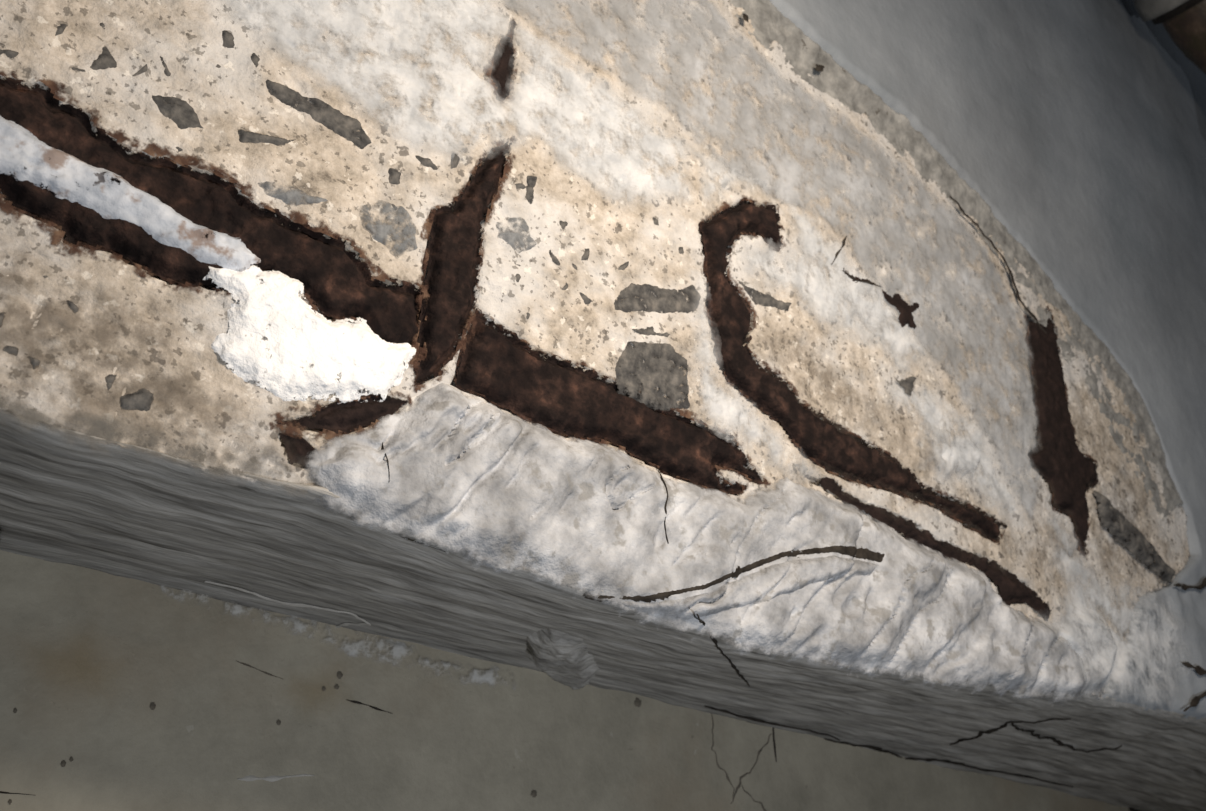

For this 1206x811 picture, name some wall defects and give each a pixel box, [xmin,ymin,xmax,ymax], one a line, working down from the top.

corrosion [483,19,518,103]
corrosion [0,193,202,293]
spalling [0,192,375,487]
corrosion [38,79,516,469]
spalling [387,322,543,428]
corrosion [671,408,771,495]
corrosion [701,196,779,223]
spalling [955,296,981,333]
spalling [1000,384,1024,451]
spalling [999,320,1034,391]
crack [1182,662,1206,711]
crack [705,706,1122,811]